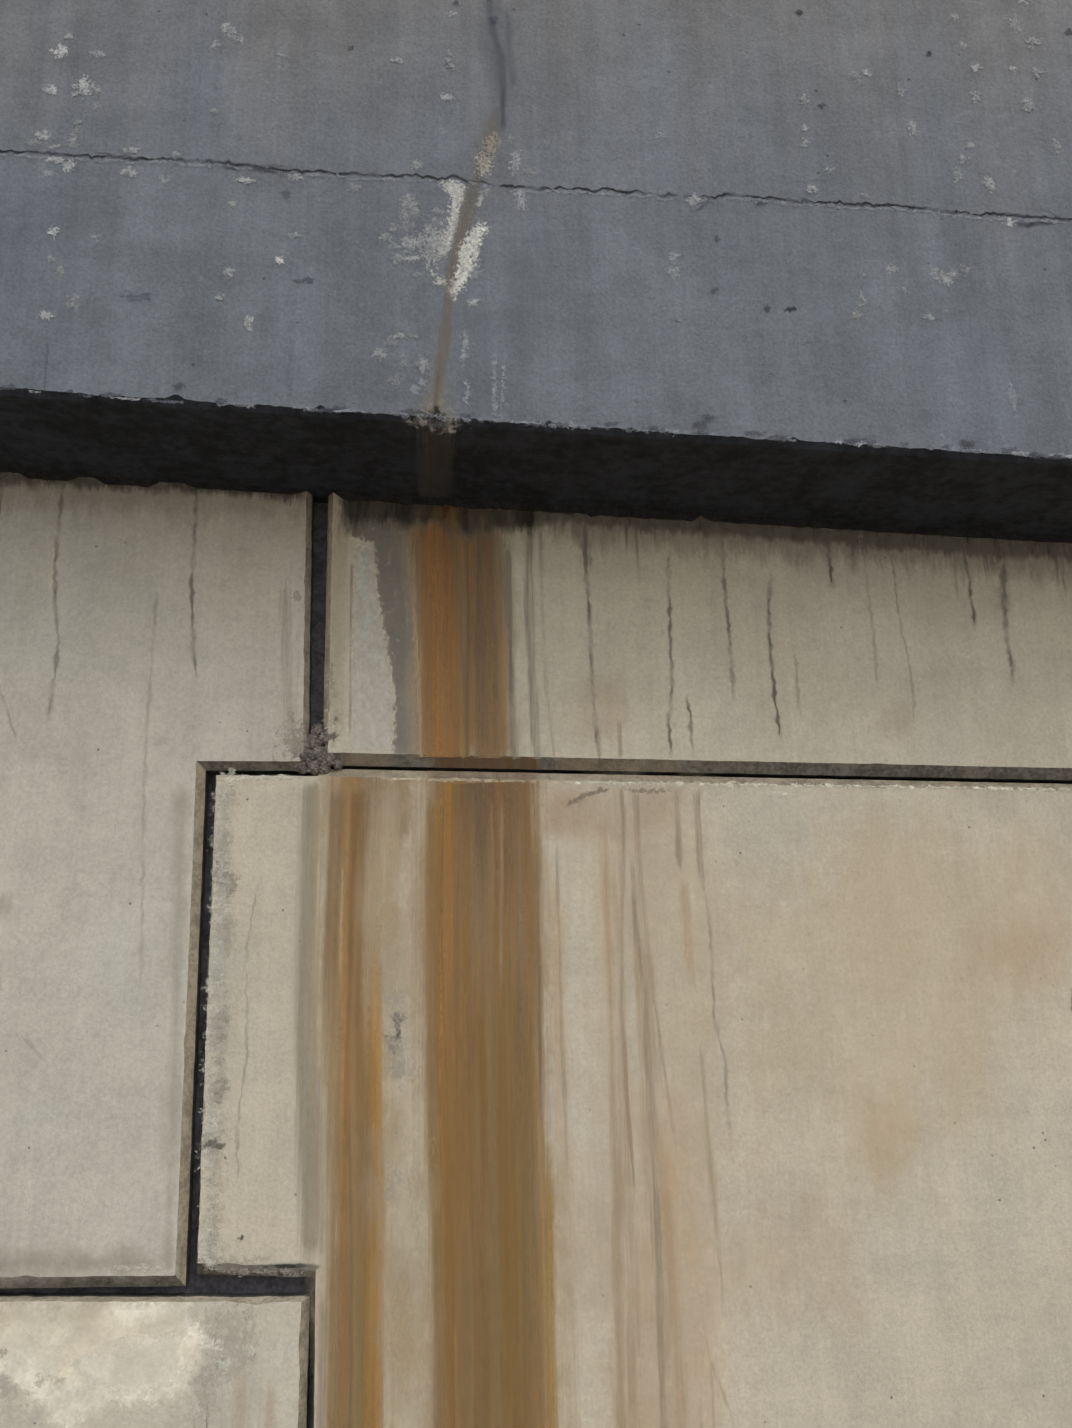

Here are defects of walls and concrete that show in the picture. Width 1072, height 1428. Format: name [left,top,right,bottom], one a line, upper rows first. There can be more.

corrosion [446,190,476,288]
crack [0,150,1072,227]
spalling [218,656,349,826]
damp [349,546,394,751]
corrosion [321,324,556,1428]
damp [552,787,669,869]
damp [667,598,692,741]
peeling [379,776,1072,798]
damp [767,592,781,735]
spalling [199,855,319,1277]
damp [624,1049,635,1188]
damp [0,1302,258,1428]